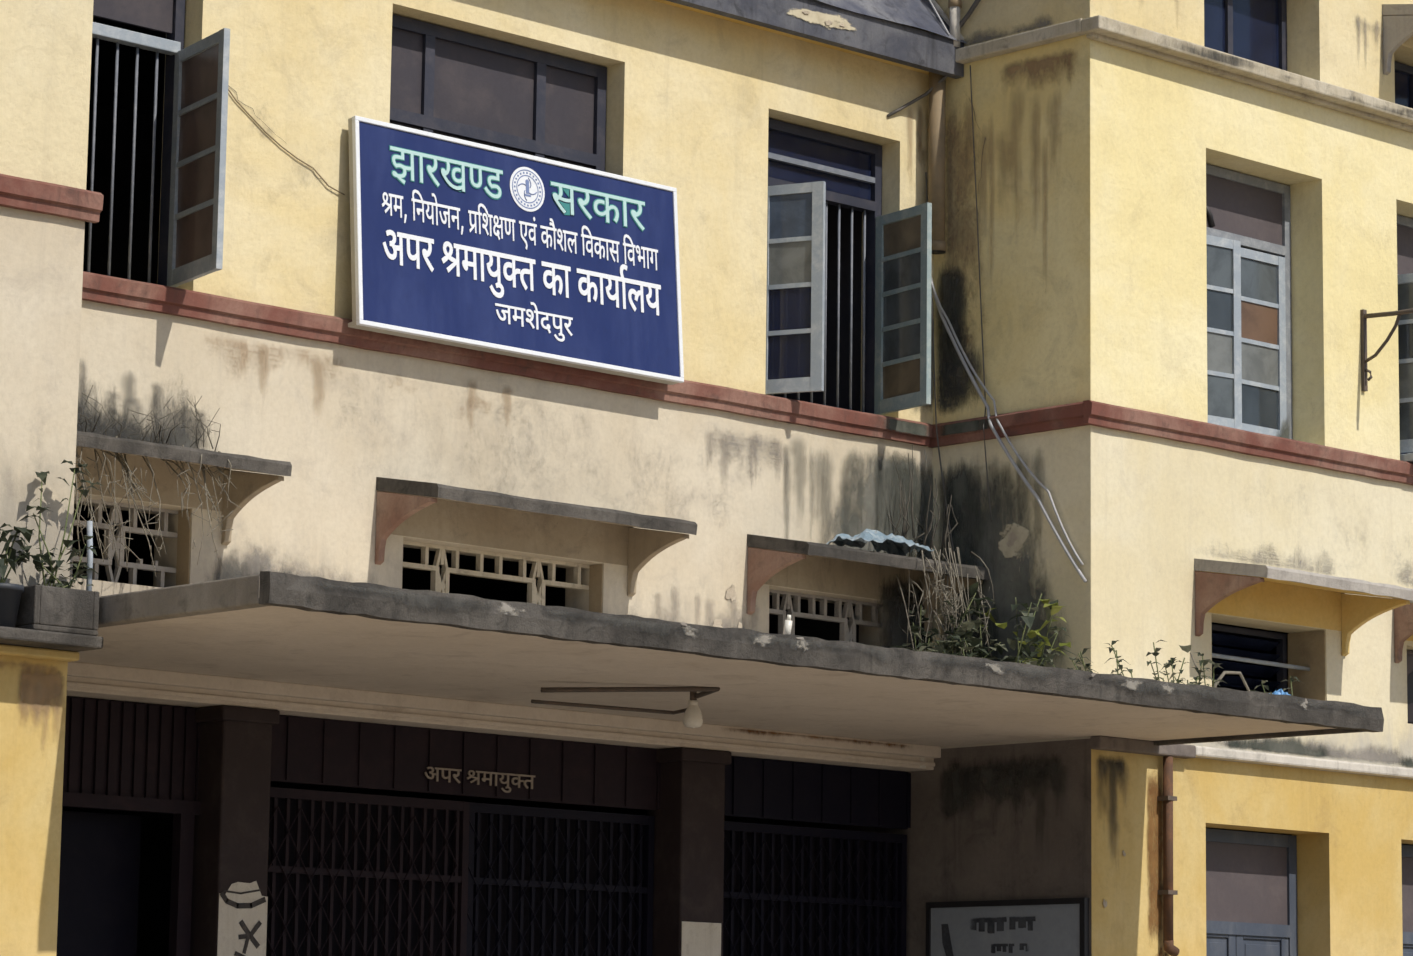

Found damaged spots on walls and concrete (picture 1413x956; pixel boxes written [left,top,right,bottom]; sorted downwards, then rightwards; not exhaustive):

peeling [787,9,855,30]
water stain [1006,53,1072,79]
water stain [923,121,980,412]
spalling [998,522,1030,558]
water stain [722,454,1064,678]
water stain [21,664,62,715]
water stain [1107,678,1220,699]
water stain [946,757,1062,815]
water stain [1099,757,1124,777]
corrosion [1148,778,1168,956]